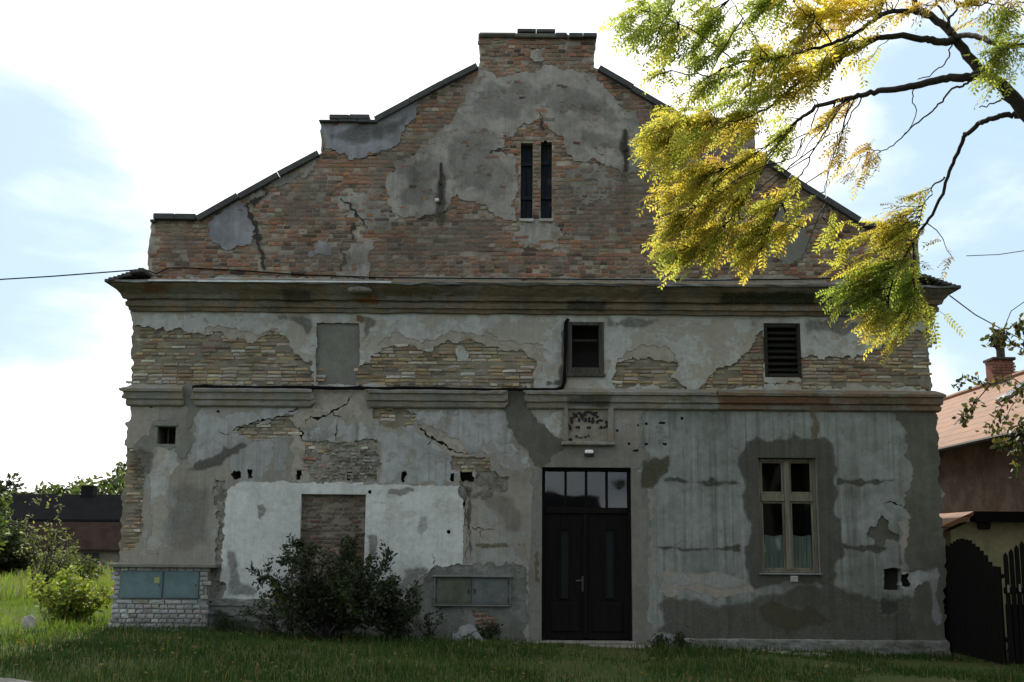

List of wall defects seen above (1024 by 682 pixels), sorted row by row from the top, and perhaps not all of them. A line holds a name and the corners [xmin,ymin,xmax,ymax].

flaking render [149,37,919,283]
crack [245,192,269,270]
crack [340,198,368,271]
peeling [126,325,326,386]
peeling [354,337,537,388]
peeling [611,327,937,391]
crack [221,395,352,442]
crack [418,425,468,455]
peeling [118,448,145,552]
spalling [229,414,382,598]
spalling [867,515,900,547]